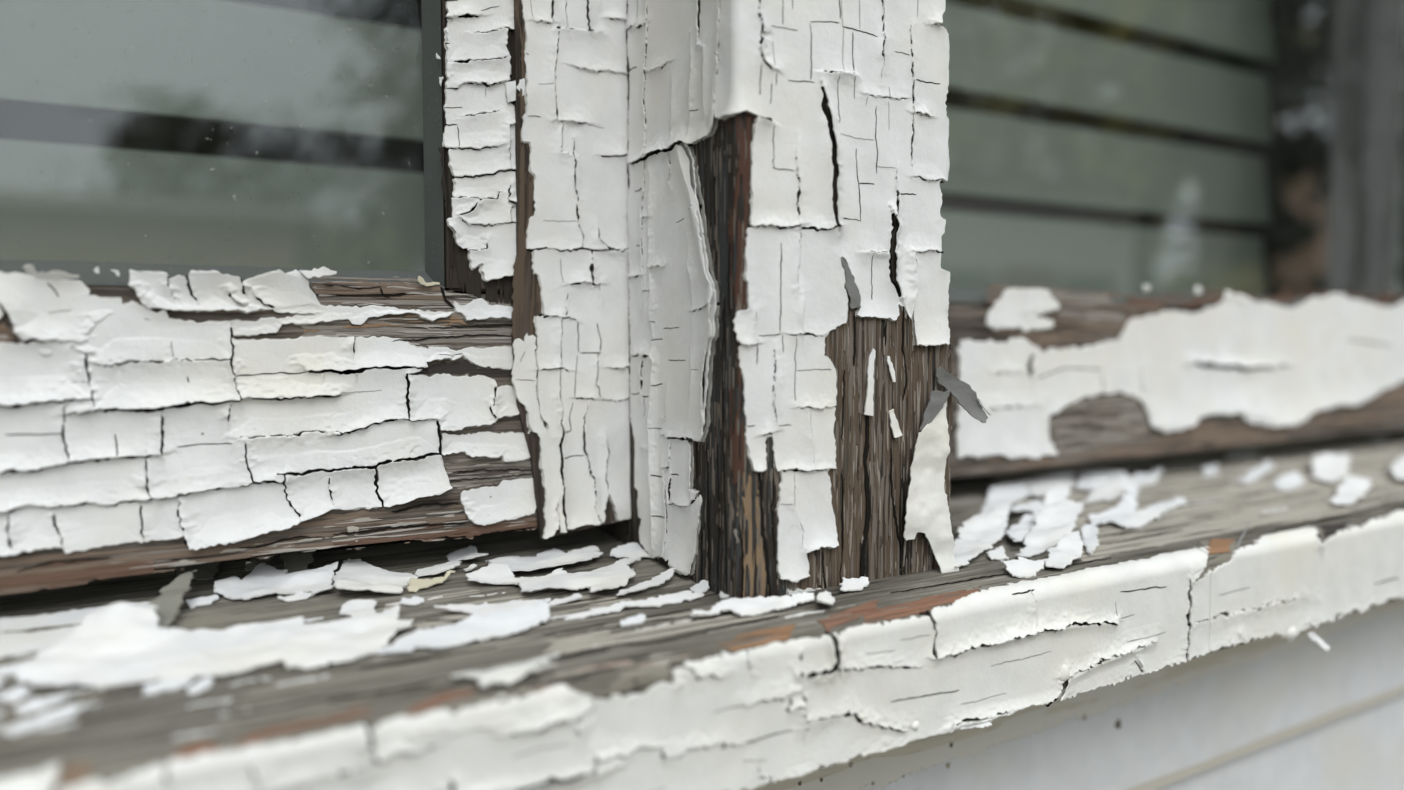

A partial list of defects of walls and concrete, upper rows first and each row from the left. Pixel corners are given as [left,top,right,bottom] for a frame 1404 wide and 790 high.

crack [444,0,720,532]
crack [739,0,944,436]
crack [0,275,463,548]
peeling [0,0,952,747]
crack [780,469,827,505]
peeling [953,506,1010,567]
peeling [1039,430,1404,581]
crack [339,722,434,777]
crack [502,721,624,790]
peeling [952,721,992,732]
crack [660,581,1294,782]